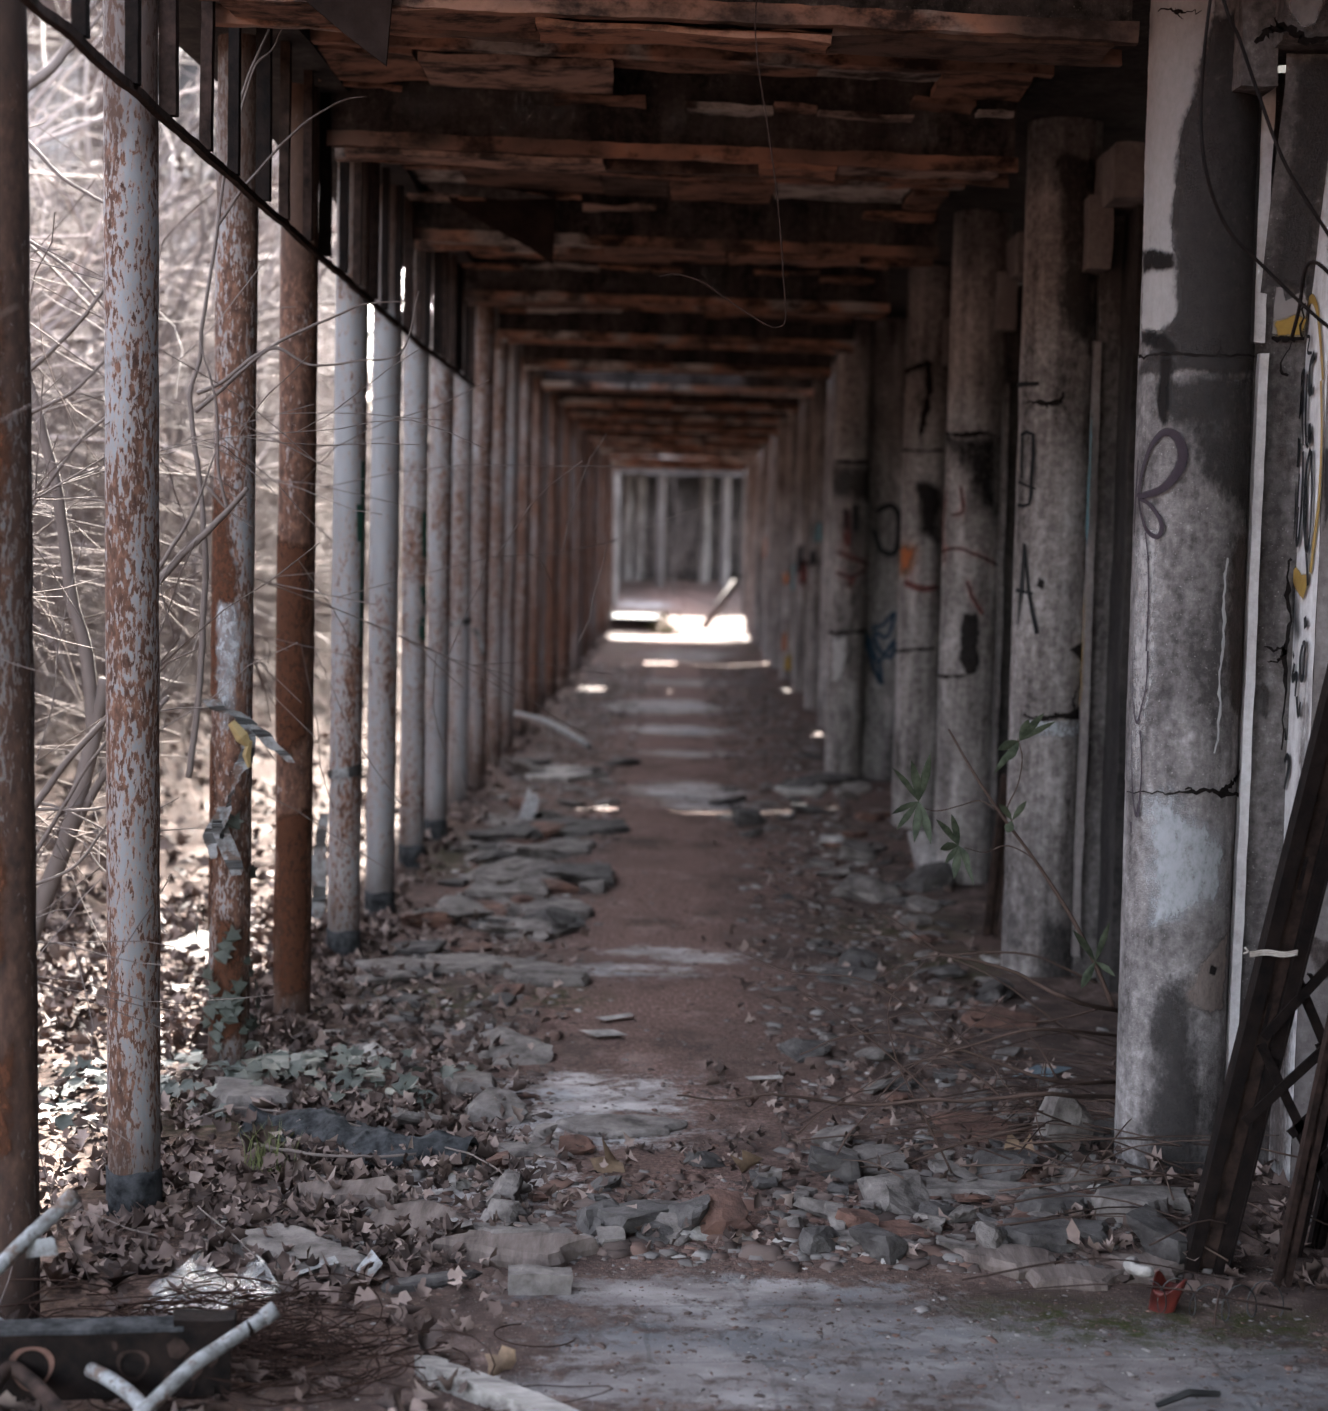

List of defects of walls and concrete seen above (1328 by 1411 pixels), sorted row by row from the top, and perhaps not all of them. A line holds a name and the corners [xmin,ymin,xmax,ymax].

peeling [1289,0,1324,27]
leakage [1139,12,1262,788]
rust [210,490,239,699]
rust [275,535,310,761]
crack [1127,770,1240,799]
rust [273,808,310,997]
leakage [1145,980,1205,1173]